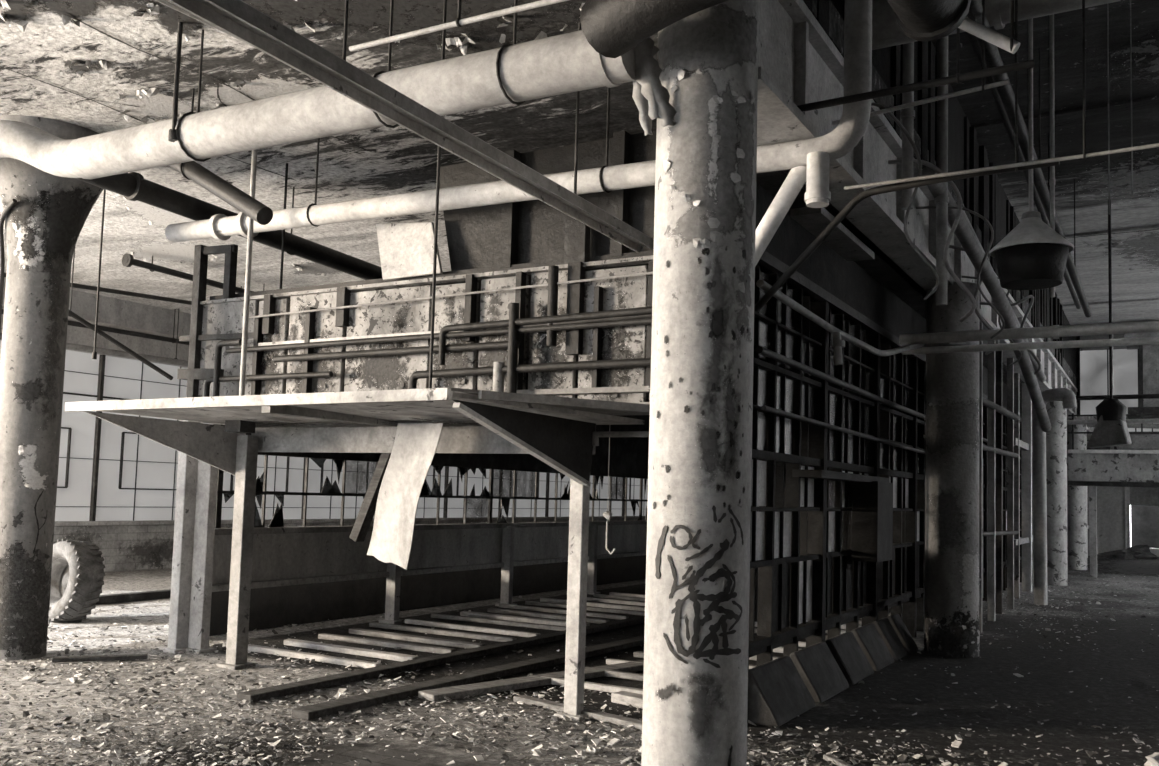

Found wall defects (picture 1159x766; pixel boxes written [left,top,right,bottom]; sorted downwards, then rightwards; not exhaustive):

peeling [0,0,203,42]
peeling [63,59,119,78]
peeling [110,85,201,124]
peeling [203,73,316,109]
peeling [1055,147,1159,202]
peeling [657,4,757,415]
peeling [3,216,45,269]
spalling [12,379,43,404]
peeling [18,444,47,490]